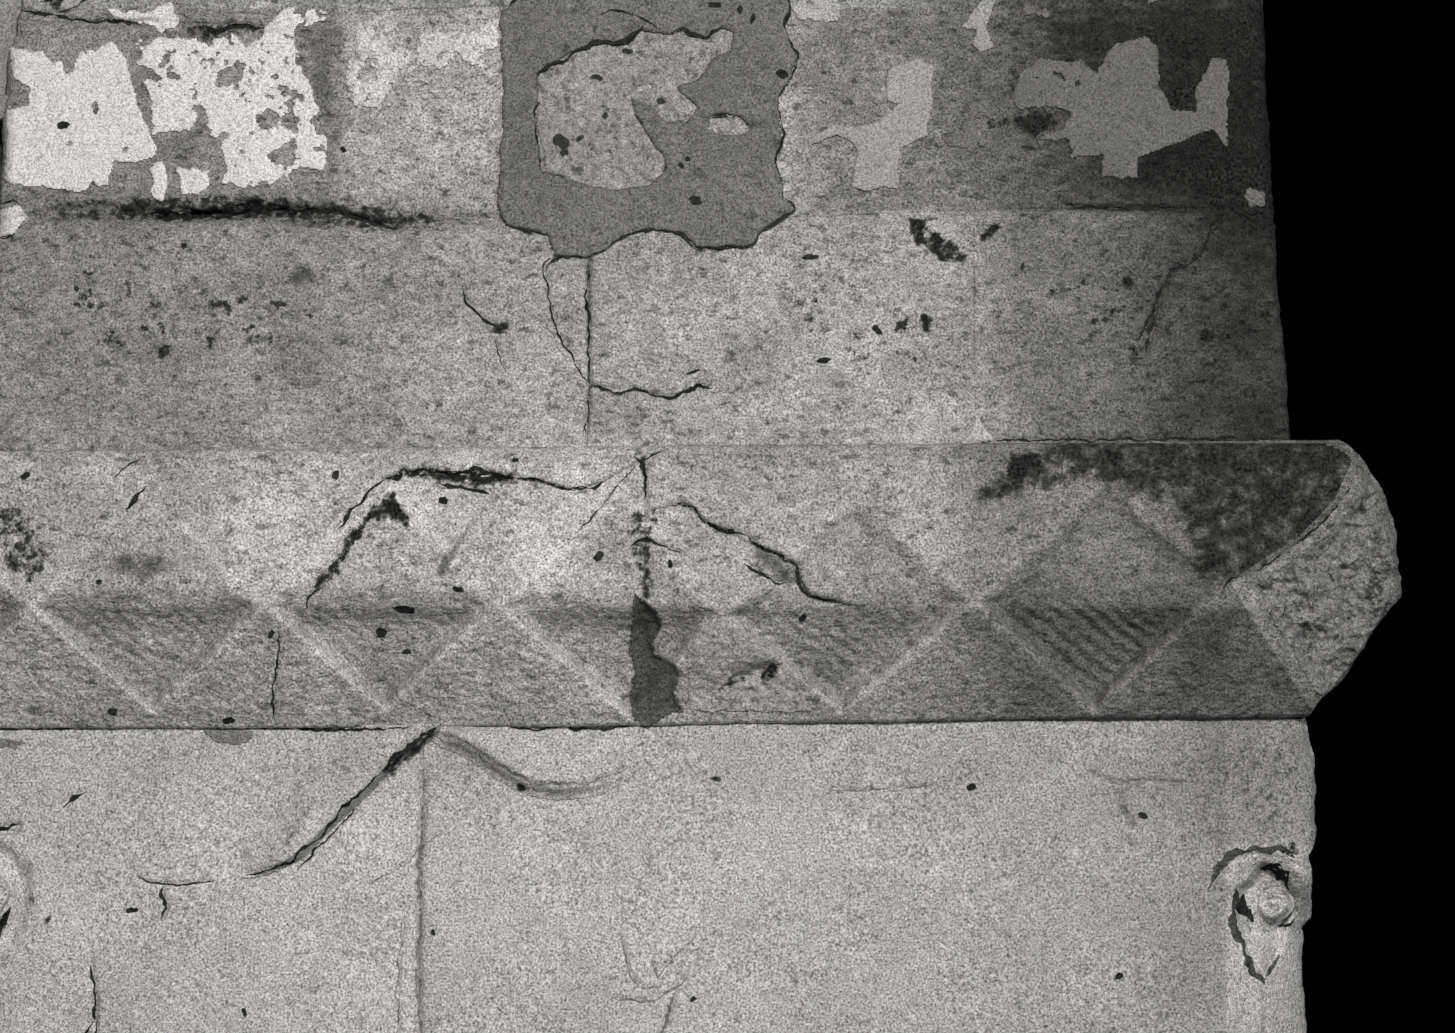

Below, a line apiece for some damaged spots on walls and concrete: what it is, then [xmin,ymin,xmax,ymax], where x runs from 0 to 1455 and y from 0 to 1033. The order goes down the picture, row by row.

peeling [4,2,327,201]
peeling [808,59,935,191]
peeling [1012,36,1229,179]
peeling [0,205,27,237]
crack [510,0,800,438]
crack [981,435,1277,443]
crack [337,450,837,601]
crack [0,725,71,733]
crack [138,877,211,919]
crack [216,633,636,1033]
crack [85,966,97,1033]